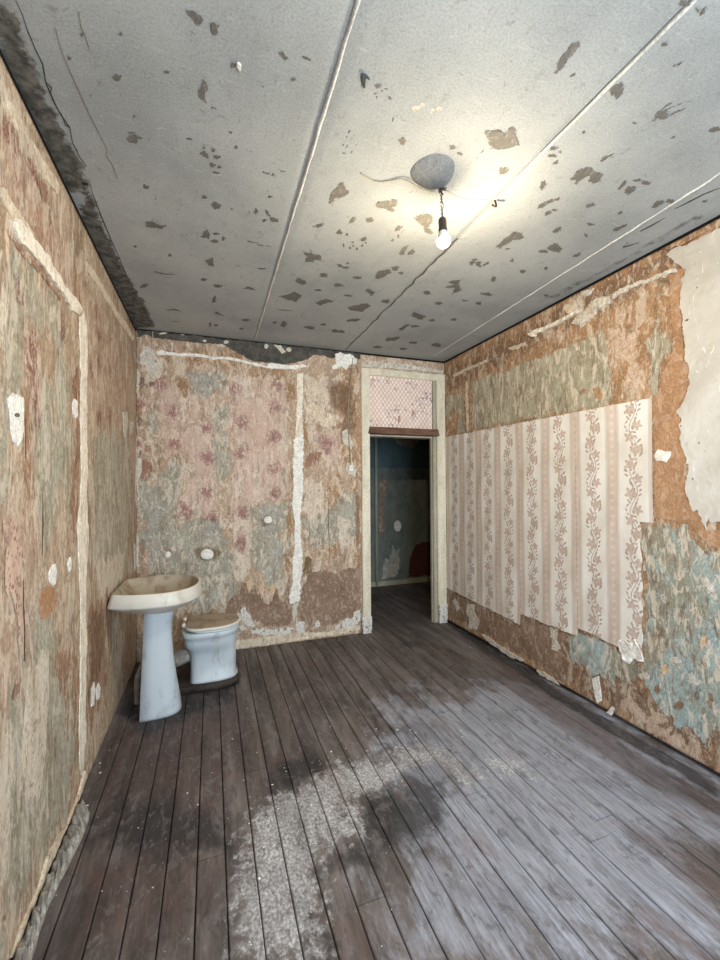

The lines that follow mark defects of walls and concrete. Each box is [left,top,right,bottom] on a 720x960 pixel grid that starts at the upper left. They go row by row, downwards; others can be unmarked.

peeling [553,41,580,77]
peeling [610,82,624,99]
crack [15,0,134,290]
peeling [477,127,519,158]
peeling [570,153,624,185]
peeling [496,231,526,273]
flaking render [0,5,486,649]
flaking render [509,227,720,548]
flaking render [0,187,101,958]
flaking render [449,593,570,685]
spalling [592,676,623,715]
spalling [617,639,682,716]